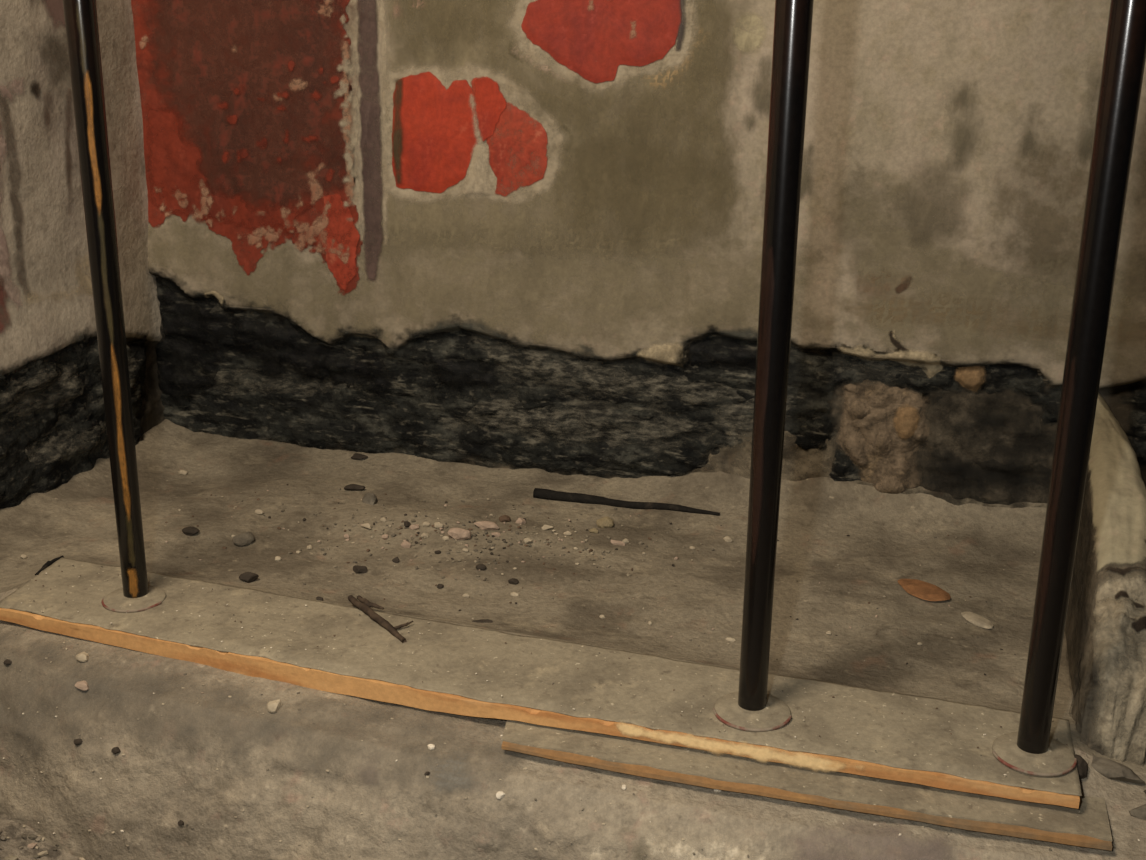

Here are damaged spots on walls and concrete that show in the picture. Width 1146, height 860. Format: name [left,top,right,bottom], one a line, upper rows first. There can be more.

peeling [131,0,363,295]
peeling [383,65,563,202]
peeling [510,0,701,91]
water stain [748,65,771,126]
water stain [800,148,811,197]
water stain [1012,152,1085,267]
spalling [0,227,38,332]
flaking render [127,271,757,479]
spalling [784,342,1062,508]